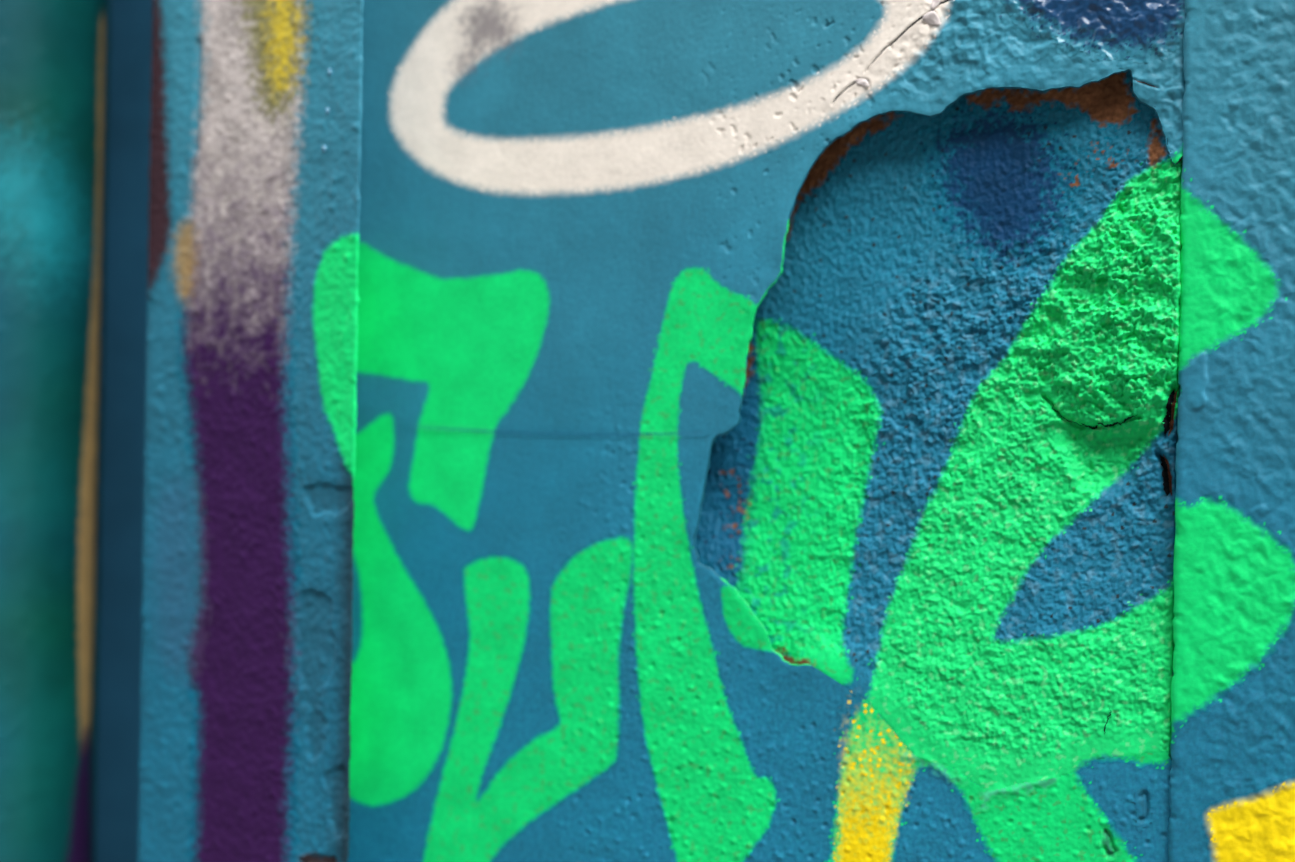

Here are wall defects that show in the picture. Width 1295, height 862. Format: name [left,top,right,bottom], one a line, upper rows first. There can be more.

crack [832,0,949,104]
spalling [693,69,1212,790]
crack [1048,399,1138,429]